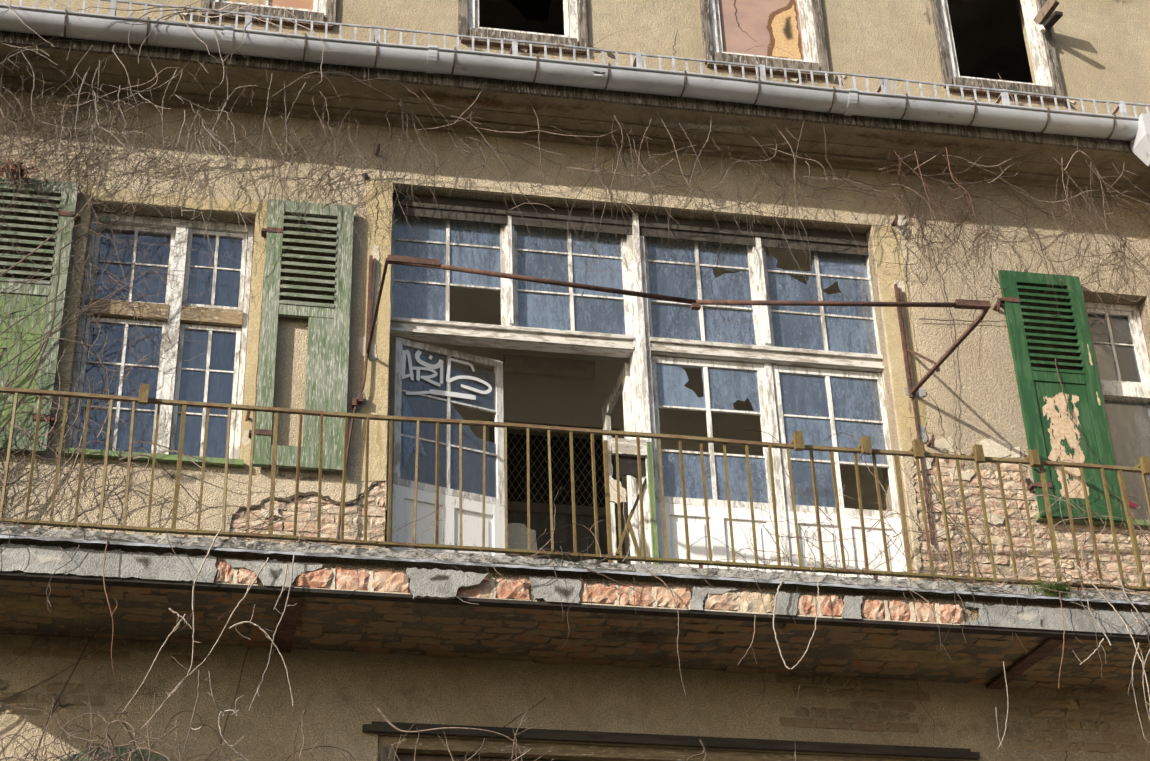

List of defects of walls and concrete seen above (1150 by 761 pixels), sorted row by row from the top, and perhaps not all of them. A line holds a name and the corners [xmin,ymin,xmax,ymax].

peeling [1042,392,1089,498]
flaking render [229,481,386,549]
flaking render [796,437,1150,625]
spalling [213,559,258,586]
spalling [294,567,410,594]
spalling [456,562,775,615]